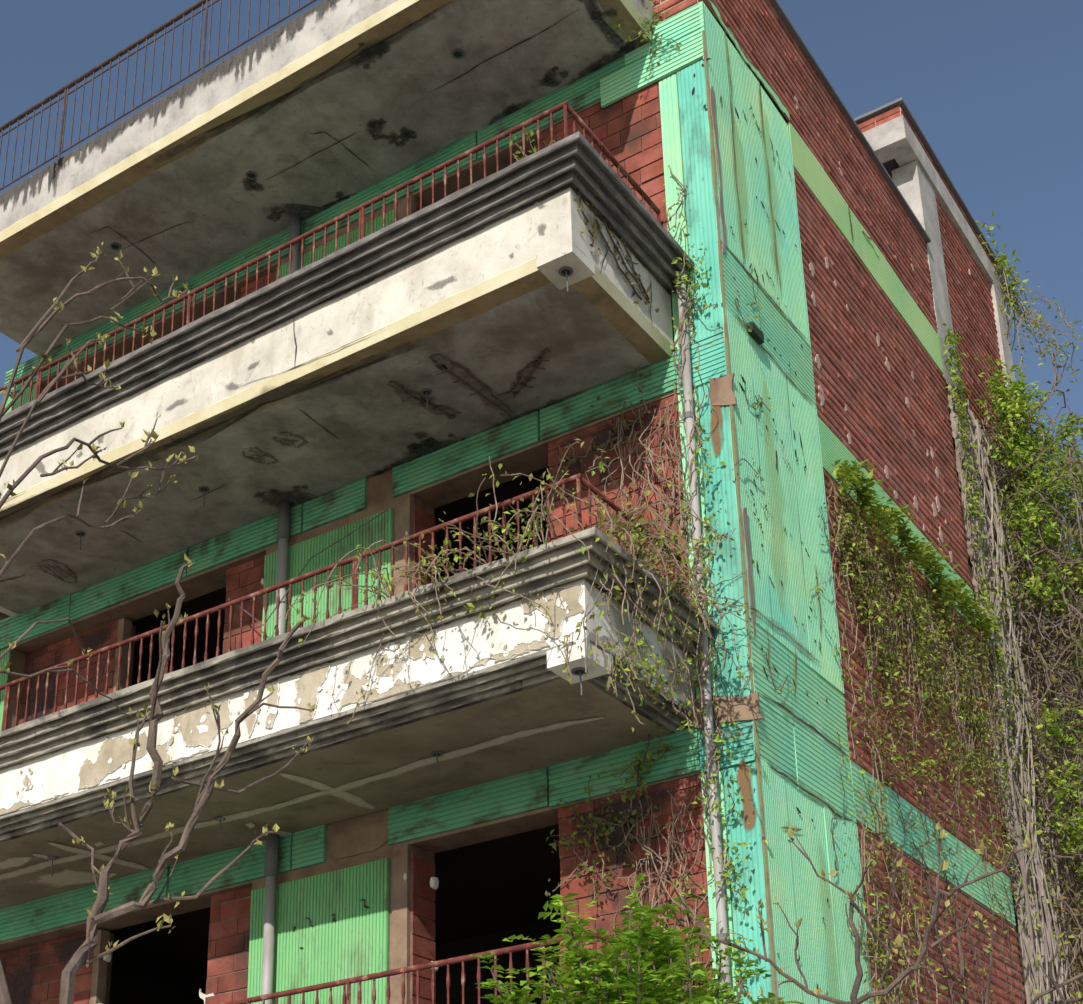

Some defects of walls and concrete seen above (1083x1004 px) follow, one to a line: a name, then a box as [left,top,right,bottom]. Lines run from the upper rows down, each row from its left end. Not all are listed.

leakage [0,0,338,211]
leakage [175,14,433,154]
crack [430,9,579,93]
leakage [489,102,528,125]
leakage [263,192,357,222]
peeling [709,373,806,475]
peeling [294,585,584,724]
peeling [0,683,280,815]
leakage [51,935,86,964]